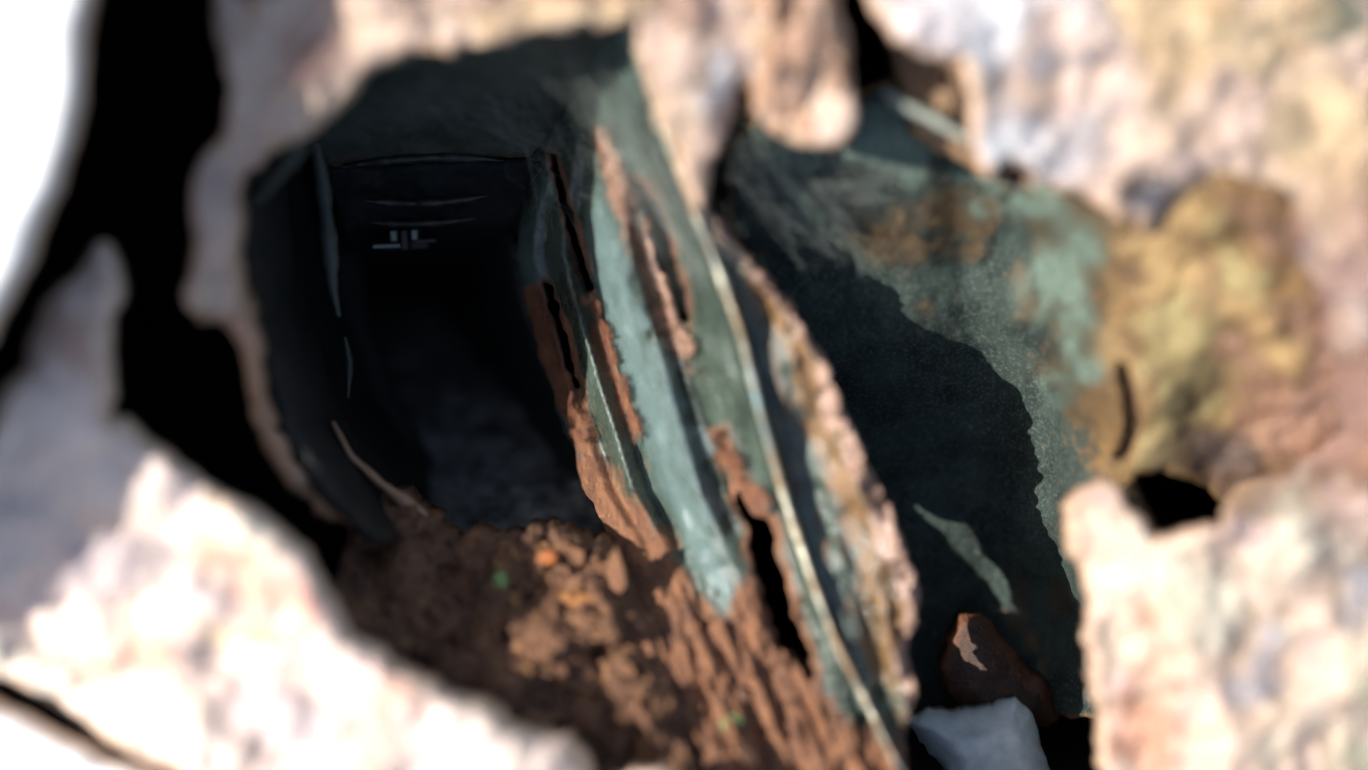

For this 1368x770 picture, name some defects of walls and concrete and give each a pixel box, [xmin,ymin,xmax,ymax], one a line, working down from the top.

spalling [999,156,1032,186]
crack [1118,312,1139,457]